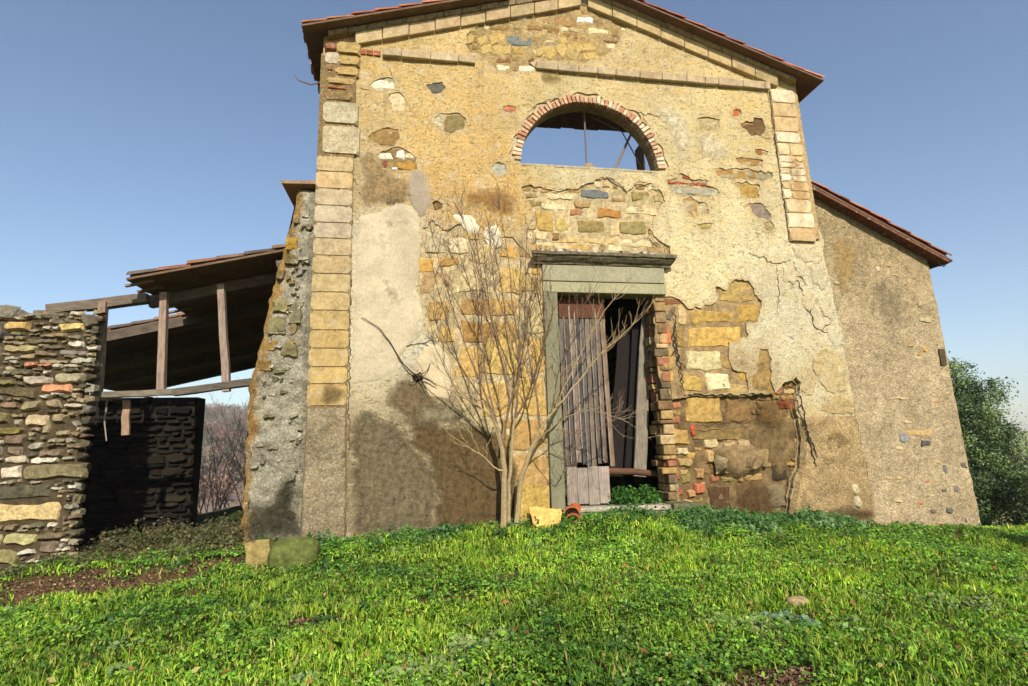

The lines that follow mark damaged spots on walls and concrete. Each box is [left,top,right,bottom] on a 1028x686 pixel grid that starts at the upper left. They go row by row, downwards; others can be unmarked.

spalling [466,4,626,73]
spalling [368,128,417,170]
spalling [434,113,466,133]
spalling [732,110,765,136]
spalling [417,149,774,497]
crack [749,252,832,333]
spalling [652,246,854,516]
damp [352,380,516,531]
crack [797,388,818,467]